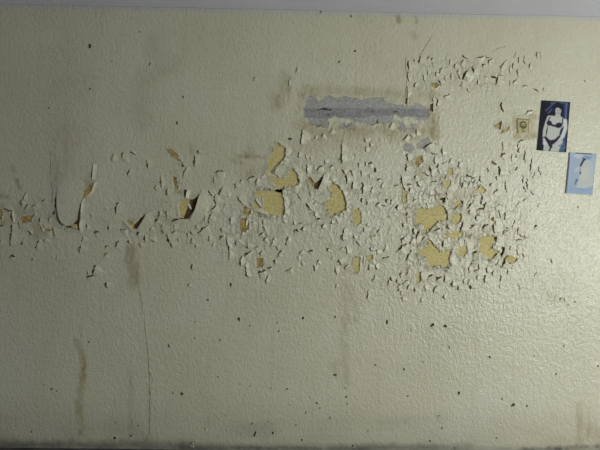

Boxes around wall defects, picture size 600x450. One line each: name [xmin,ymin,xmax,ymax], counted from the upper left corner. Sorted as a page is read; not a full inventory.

peeling [390,52,546,114]
peeling [0,164,100,261]
peeling [103,116,544,303]
crack [138,286,153,434]